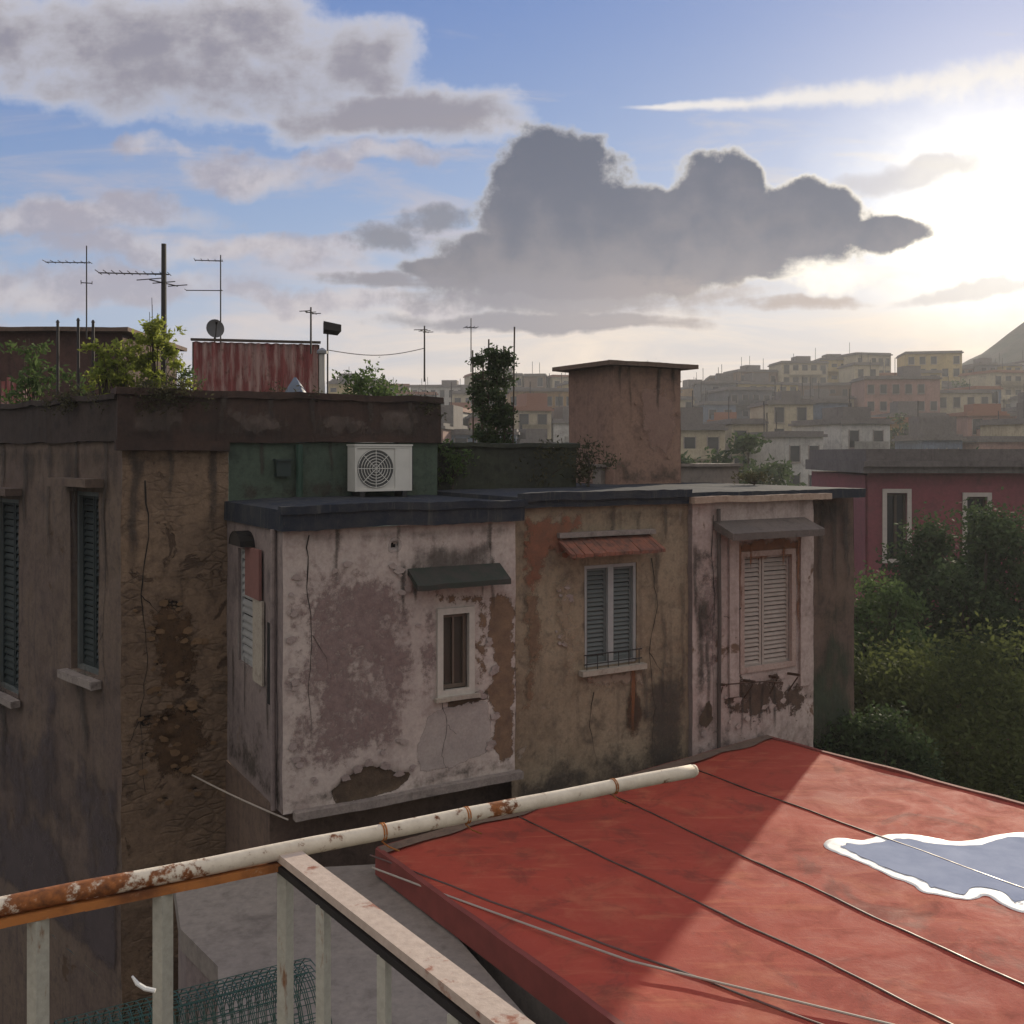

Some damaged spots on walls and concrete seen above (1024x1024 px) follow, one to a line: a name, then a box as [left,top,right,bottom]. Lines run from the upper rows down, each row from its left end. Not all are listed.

crack [128,480,163,792]
crack [306,535,330,714]
peeling [285,561,436,803]
flaking render [436,515,582,762]
corrosion [627,670,642,735]
flaking render [724,673,811,729]